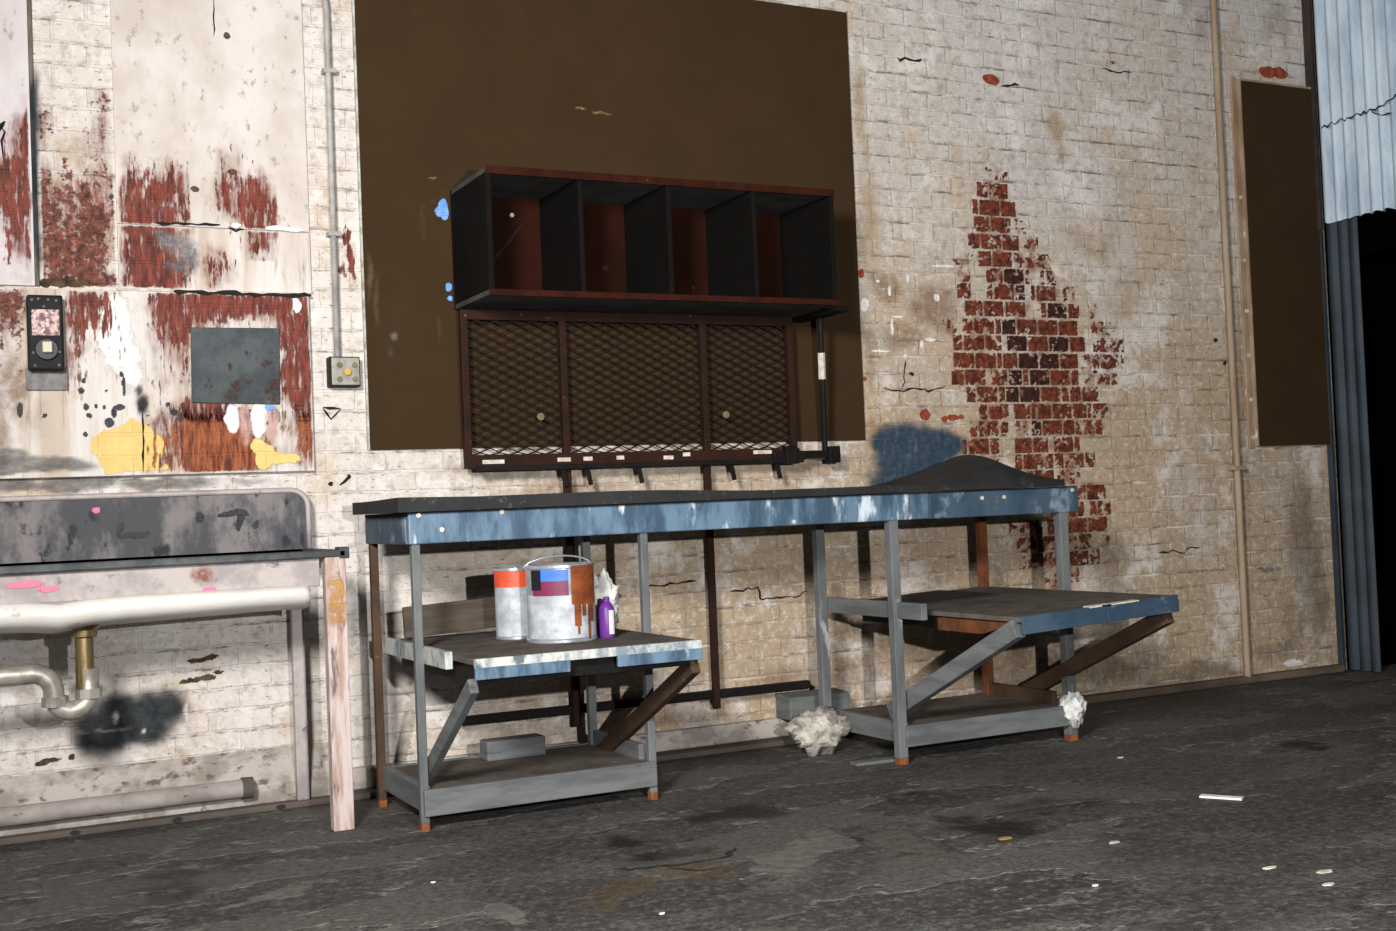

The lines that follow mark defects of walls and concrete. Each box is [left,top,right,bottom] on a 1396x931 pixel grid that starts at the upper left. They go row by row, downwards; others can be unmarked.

spalling [40,276,90,288]
flaking render [872,167,1124,590]